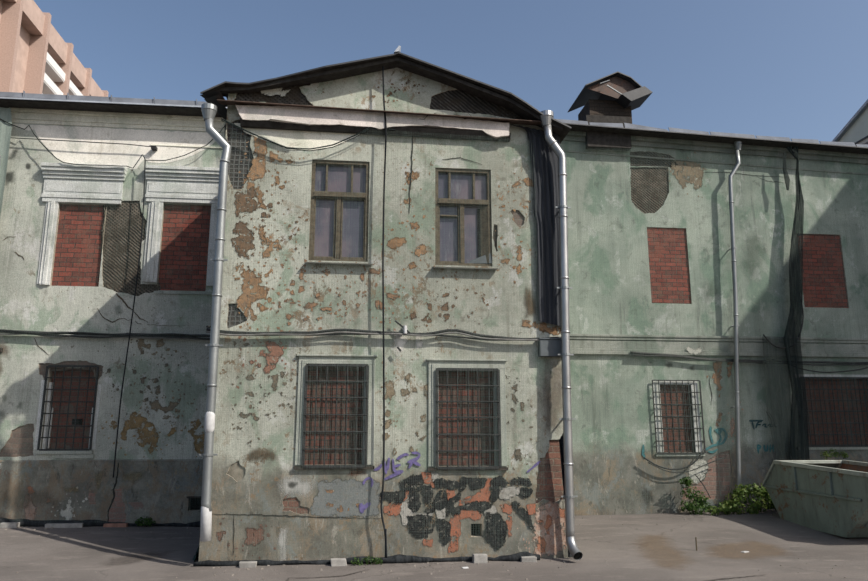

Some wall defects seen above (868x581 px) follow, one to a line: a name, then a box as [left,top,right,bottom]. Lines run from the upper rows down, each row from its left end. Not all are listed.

peeling [261,88,291,96]
crack [407,113,471,210]
peeling [630,151,711,198]
peeling [493,171,533,287]
crack [97,293,184,326]
peeling [230,135,497,462]
flaking render [0,423,34,457]
flaking render [39,360,119,398]
peeling [98,328,205,464]
peeling [505,369,533,440]
crack [107,464,119,522]
flaking render [513,439,567,558]